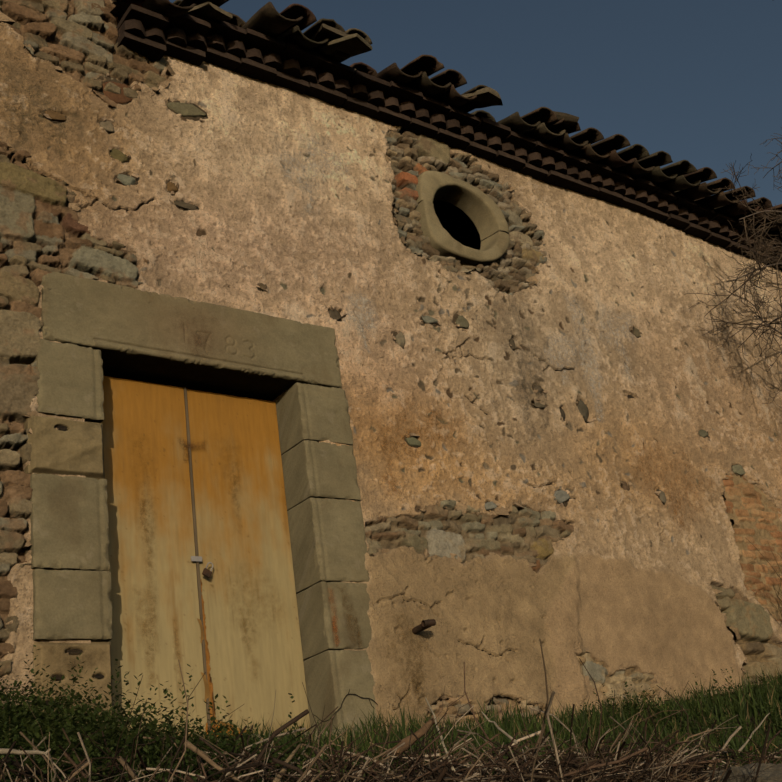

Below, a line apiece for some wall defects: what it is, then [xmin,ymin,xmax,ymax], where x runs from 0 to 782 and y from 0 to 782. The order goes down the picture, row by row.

flaking render [0,0,208,124]
flaking render [383,126,547,296]
flaking render [0,141,149,690]
flaking render [365,490,574,573]
flaking render [711,464,782,694]
peeling [427,693,547,735]
spalling [575,646,663,709]